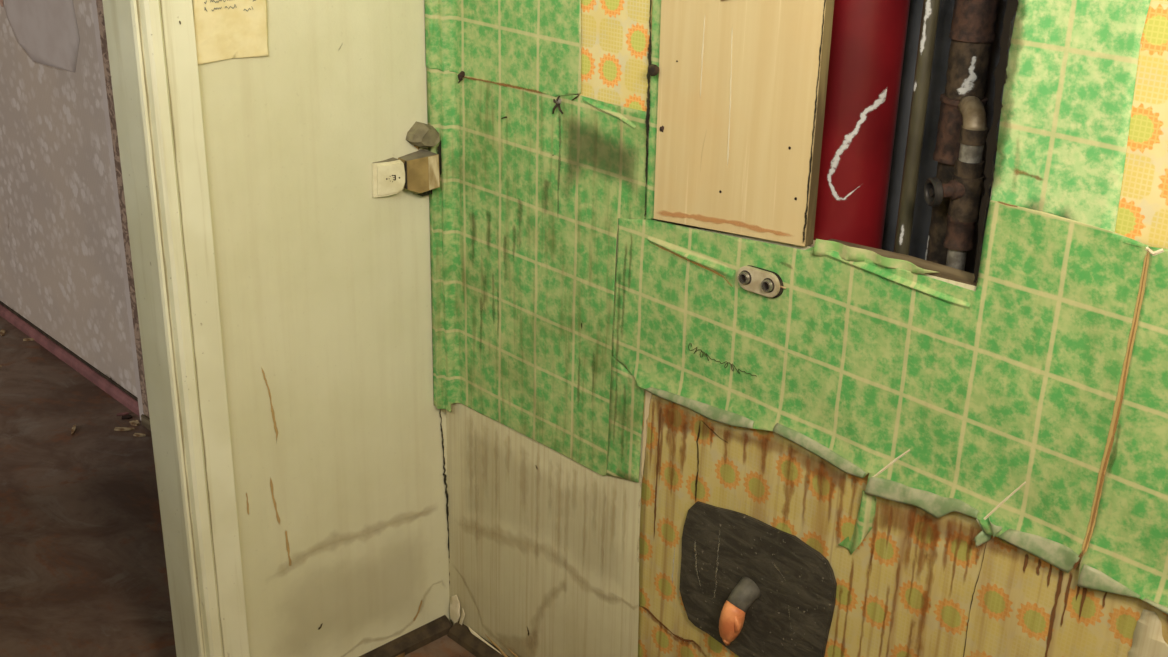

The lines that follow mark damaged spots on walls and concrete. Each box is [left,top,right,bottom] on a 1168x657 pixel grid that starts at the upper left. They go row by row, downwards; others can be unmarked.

peeling [920,0,931,52]
damp [558,117,630,189]
damp [644,0,652,216]
peeling [958,56,977,94]
damp [439,409,450,583]
peeling [640,391,652,485]
rust [1023,253,1149,657]
peeling [449,595,518,657]
rust [906,511,979,654]